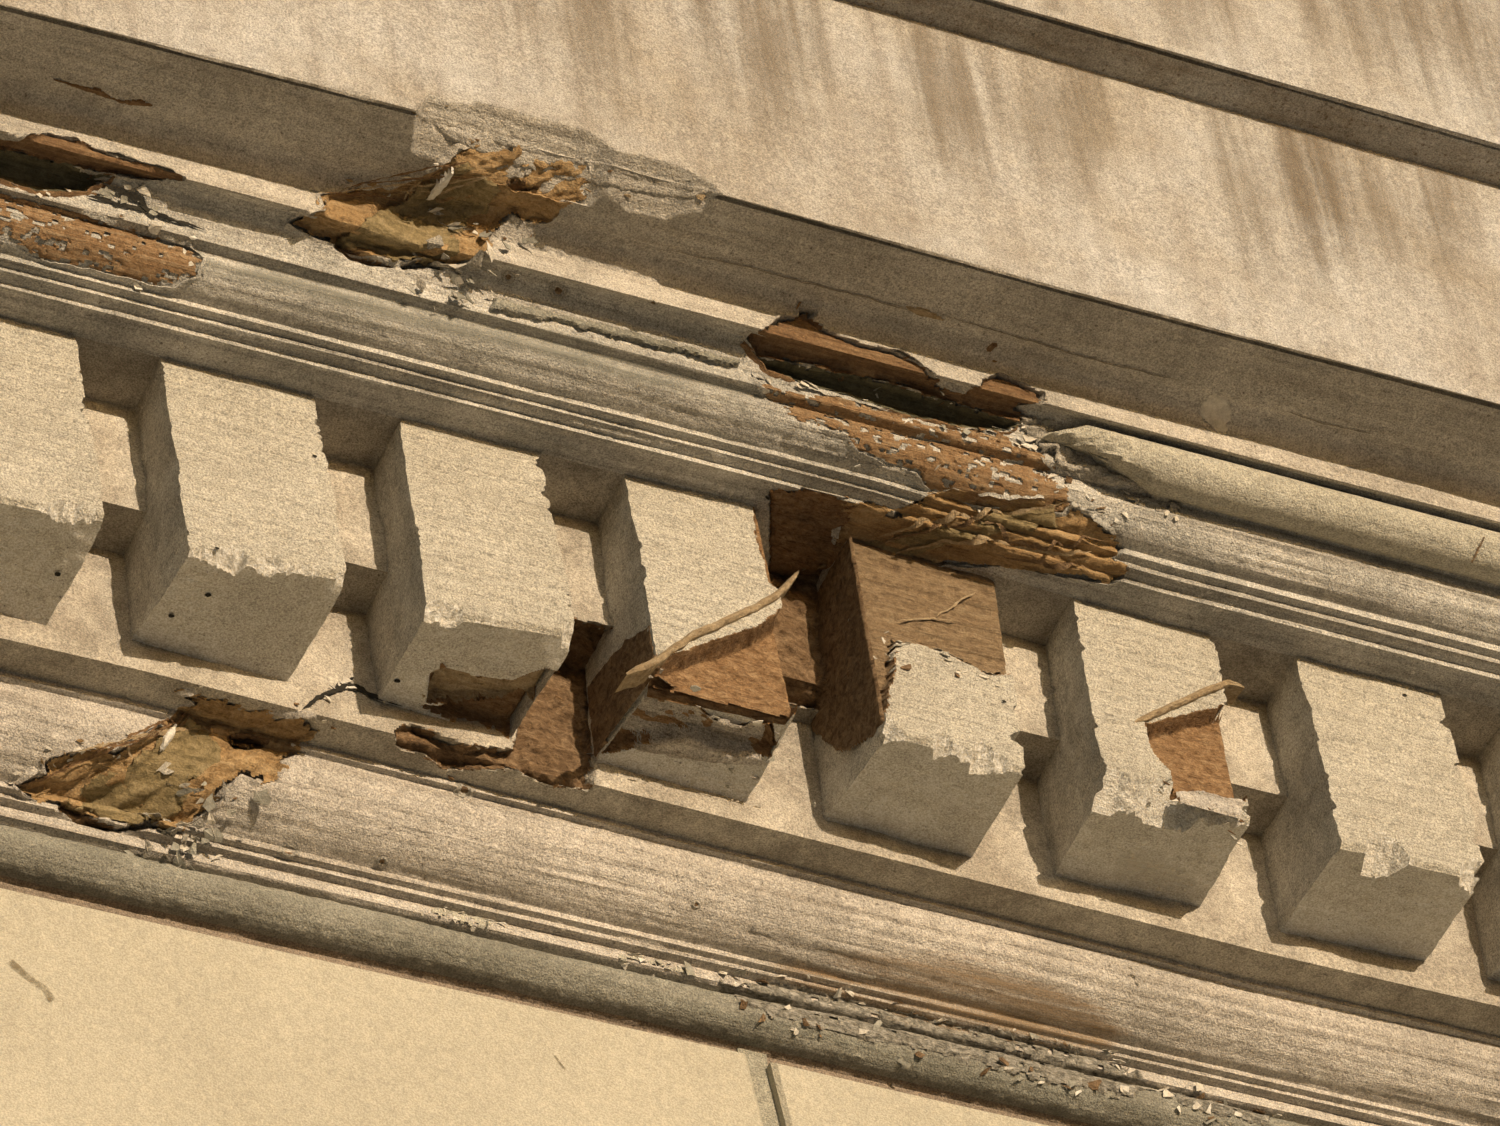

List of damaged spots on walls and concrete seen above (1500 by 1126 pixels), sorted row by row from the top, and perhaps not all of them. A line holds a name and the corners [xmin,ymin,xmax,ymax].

peeling [0,132,209,293]
spalling [284,95,722,313]
spalling [394,302,1183,790]
spalling [5,685,336,871]
crack [302,676,401,710]
spalling [1135,680,1247,846]